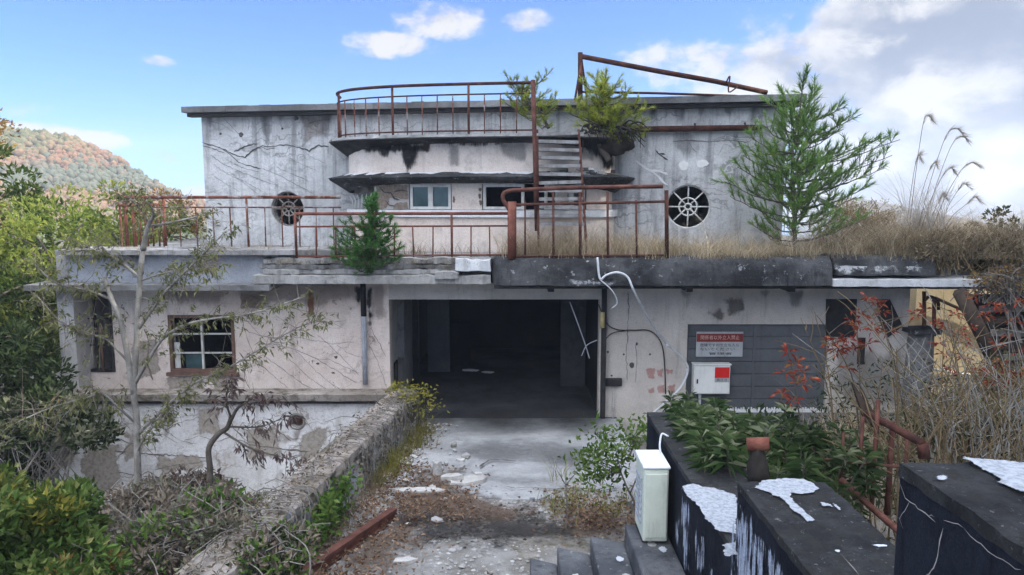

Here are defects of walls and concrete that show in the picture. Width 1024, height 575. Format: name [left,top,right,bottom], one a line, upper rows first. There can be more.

crack [202,117,330,196]
leakage [380,144,418,169]
peeling [52,431,144,491]
peeling [157,454,203,473]
peeling [247,425,281,459]
peeling [299,428,327,464]
peeling [755,478,841,521]
peeling [676,484,780,575]
crack [898,480,1020,575]